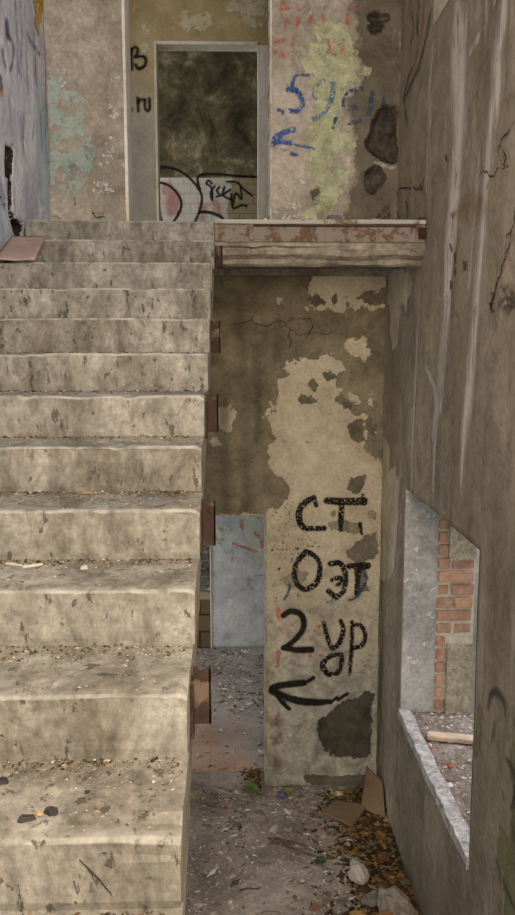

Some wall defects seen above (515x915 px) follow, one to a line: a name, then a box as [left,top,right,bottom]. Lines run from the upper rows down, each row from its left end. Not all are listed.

flaking render [0,145,22,236]
peeling [47,58,115,195]
peeling [274,18,399,220]
spalling [367,11,390,34]
crack [479,120,515,313]
peeling [204,268,413,762]